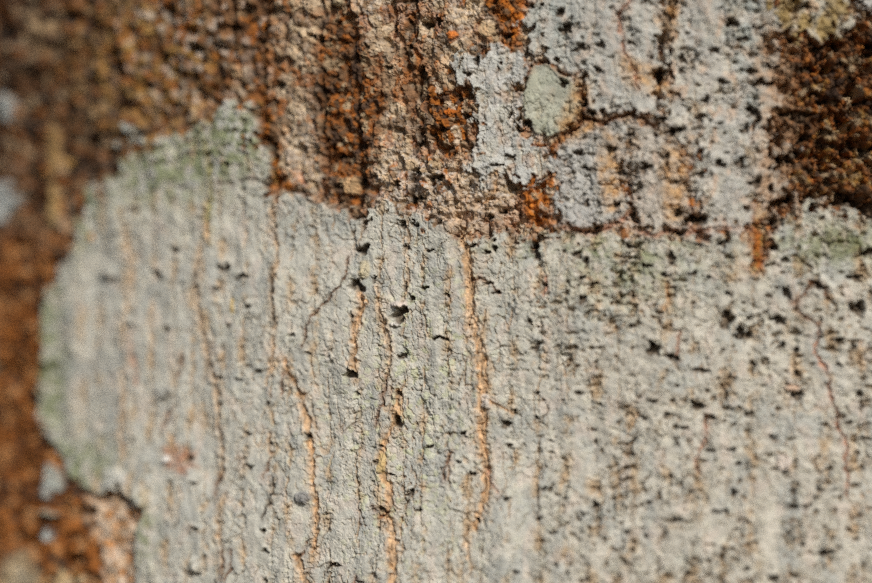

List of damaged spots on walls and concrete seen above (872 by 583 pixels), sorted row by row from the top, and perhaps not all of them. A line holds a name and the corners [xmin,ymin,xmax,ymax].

spalling [308,33,333,47]
corrosion [313,1,389,216]
corrosion [424,79,475,163]
corrosion [271,150,297,204]
corrosion [458,171,560,235]
spalling [402,283,430,306]
crack [175,137,334,583]
crack [347,124,430,583]
crack [441,143,514,583]
crack [792,280,851,500]
spalling [844,390,865,427]
spalling [712,488,739,516]